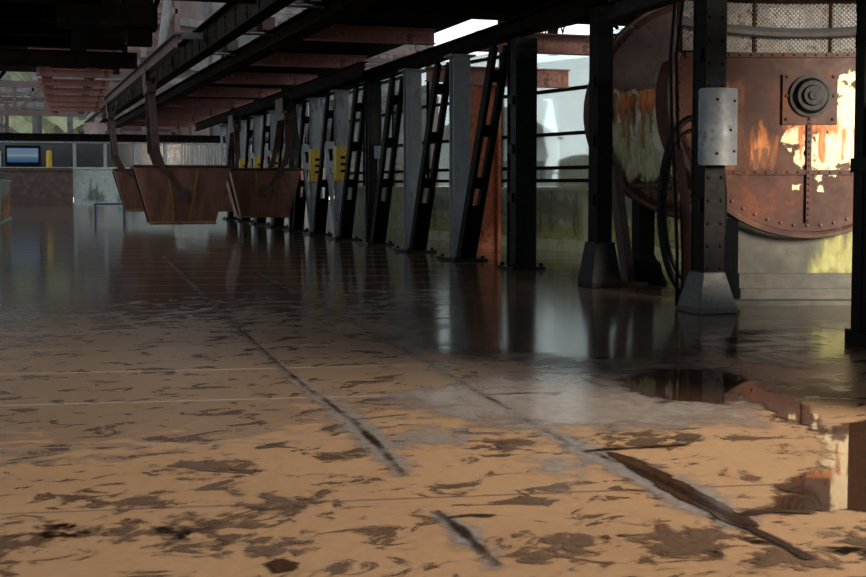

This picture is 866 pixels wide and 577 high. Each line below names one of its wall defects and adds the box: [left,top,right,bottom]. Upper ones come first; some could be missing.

rust [613,84,656,148]
peeling [612,89,677,182]
rust [737,122,774,170]
rust [787,122,846,162]
peeling [781,70,855,192]
crack [163,256,415,476]
crack [259,273,816,560]
leakage [596,428,702,450]
crack [433,510,501,569]